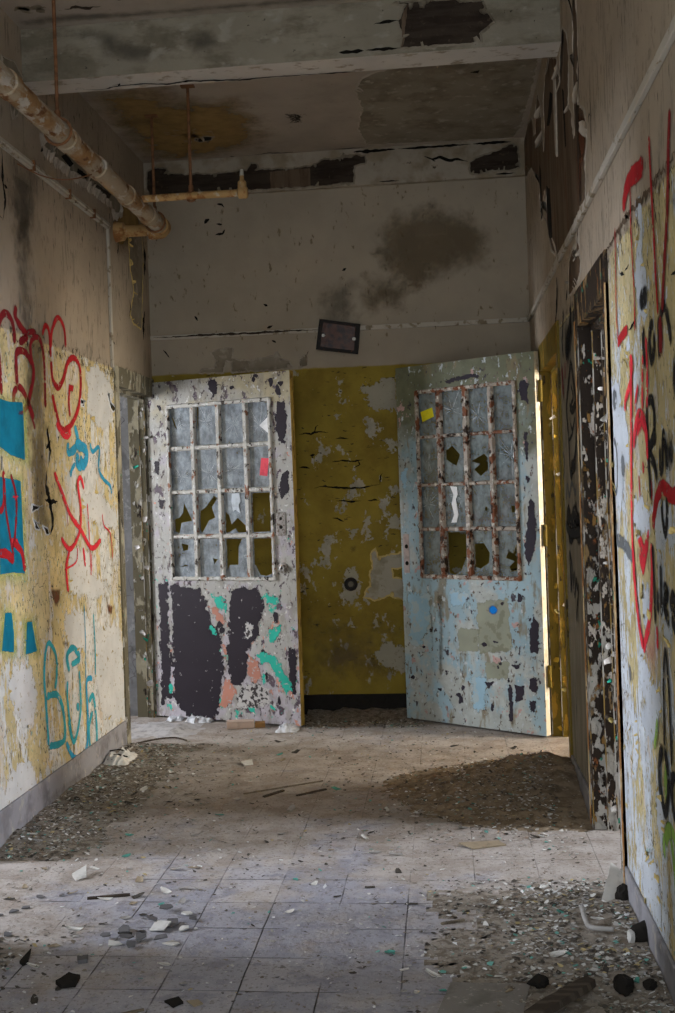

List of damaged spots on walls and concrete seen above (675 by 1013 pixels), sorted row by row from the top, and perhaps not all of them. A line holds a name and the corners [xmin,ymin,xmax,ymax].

leakage [102,91,252,158]
peeling [145,0,587,298]
leakage [385,215,480,286]
peeling [634,197,650,325]
peeling [80,363,115,430]
peeling [598,347,675,564]
peeling [81,485,117,531]
peeling [63,543,125,723]
peeling [341,514,403,604]
peeling [639,579,651,629]
peeling [8,661,38,730]
peeling [608,654,662,837]